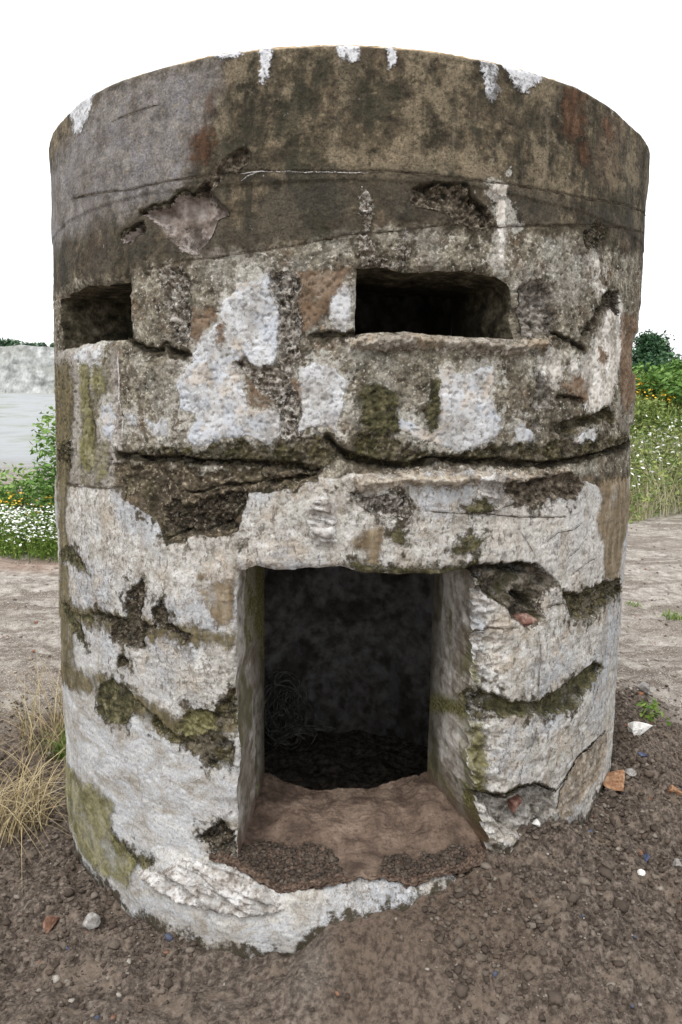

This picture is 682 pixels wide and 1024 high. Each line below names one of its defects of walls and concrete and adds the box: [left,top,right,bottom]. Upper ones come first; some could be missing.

crack [71,170,646,270]
peeling [74,344,102,368]
peeling [101,143,629,544]
spalling [465,561,623,632]
crack [467,688,606,799]
spalling [473,733,607,840]